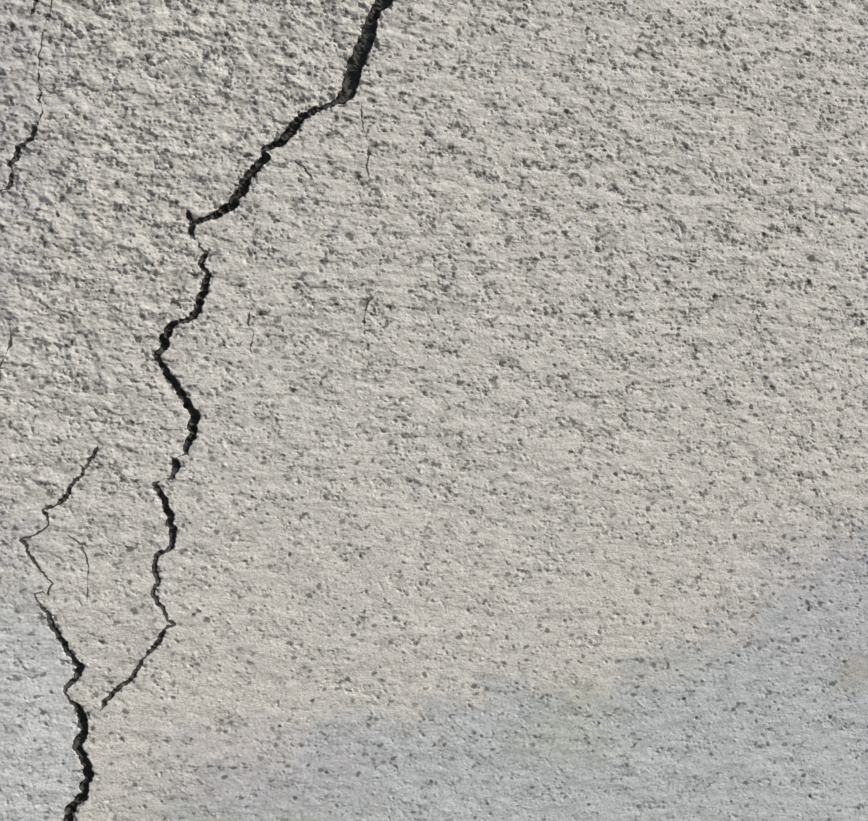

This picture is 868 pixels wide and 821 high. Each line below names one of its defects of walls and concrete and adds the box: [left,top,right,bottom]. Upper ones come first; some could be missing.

crack [0,0,53,191]
crack [19,0,392,821]